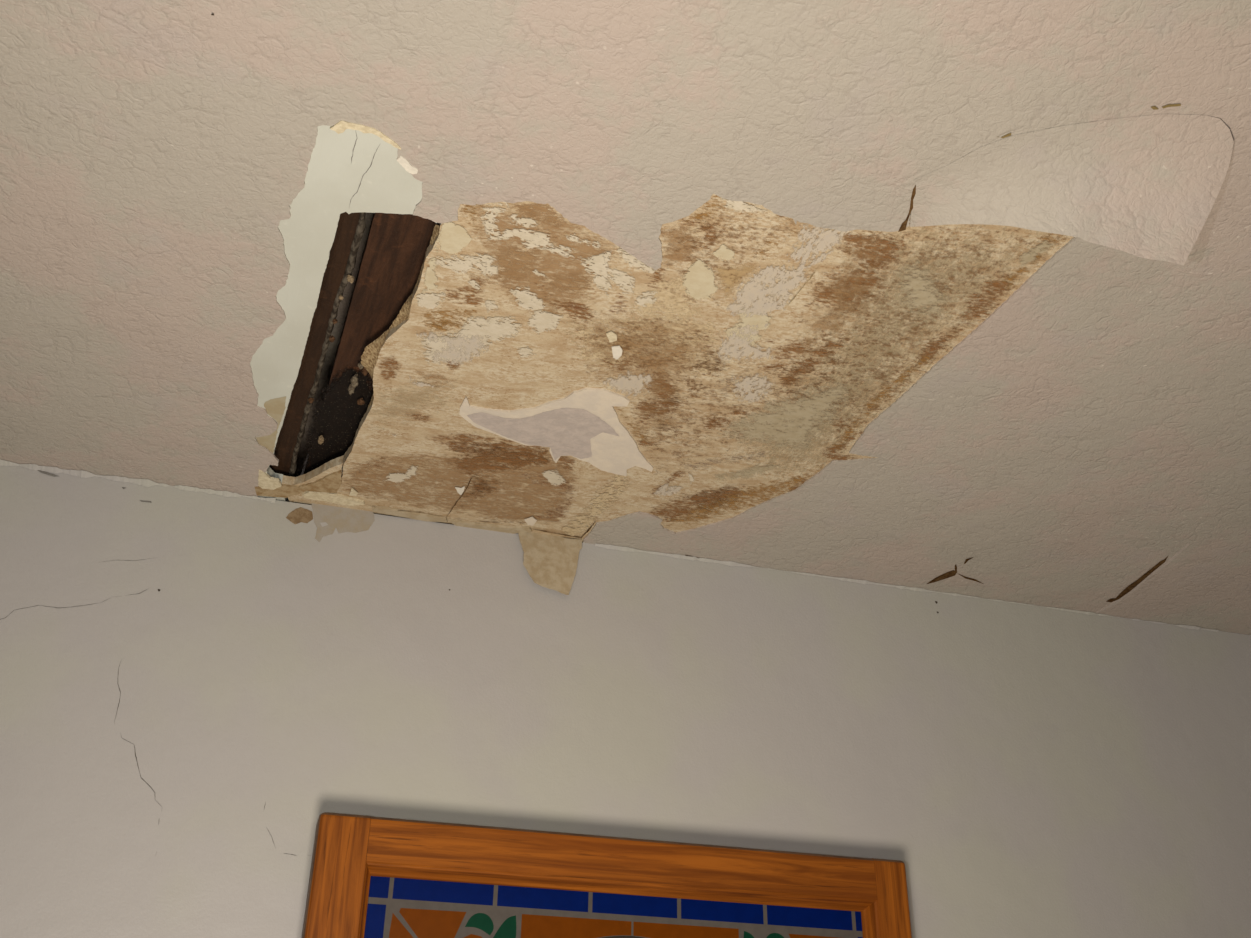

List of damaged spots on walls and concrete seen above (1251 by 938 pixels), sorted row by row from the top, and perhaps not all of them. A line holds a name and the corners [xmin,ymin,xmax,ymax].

flaking render [250,114,1234,595]
crack [1096,543,1190,613]